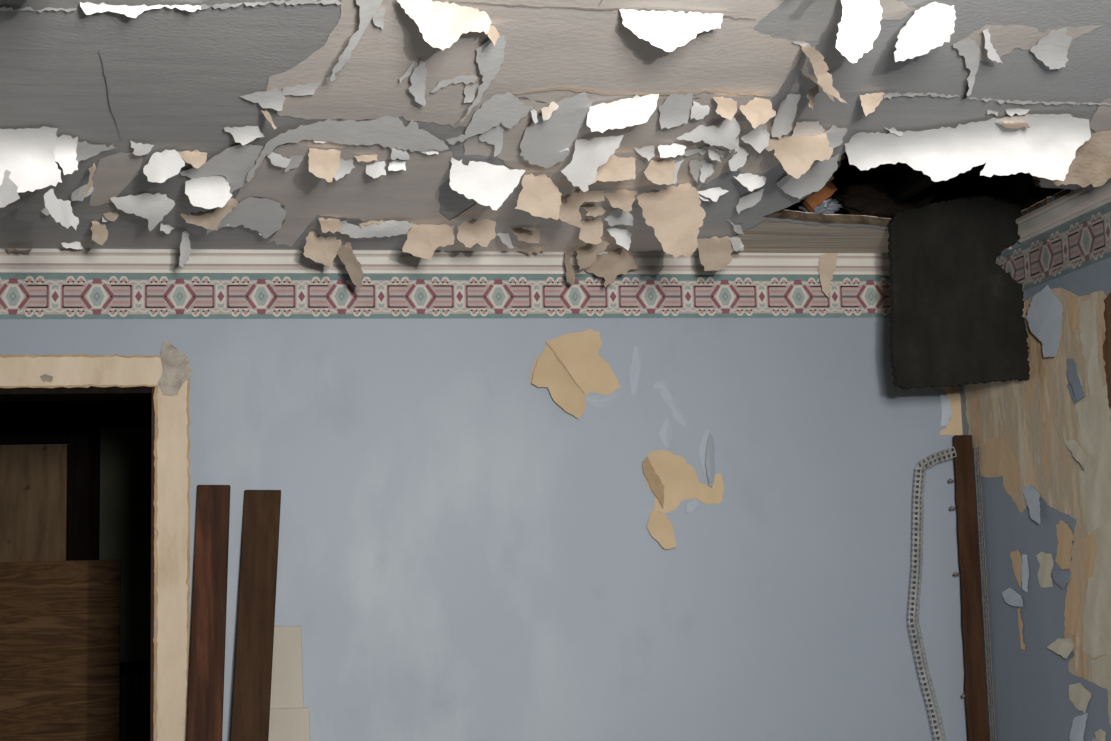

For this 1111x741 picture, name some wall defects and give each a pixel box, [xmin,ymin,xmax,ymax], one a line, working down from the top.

peeling [0,0,1111,291]
peeling [530,329,621,419]
peeling [642,433,724,549]
peeling [981,437,1021,490]
peeling [1037,292,1111,716]
peeling [1010,550,1022,587]